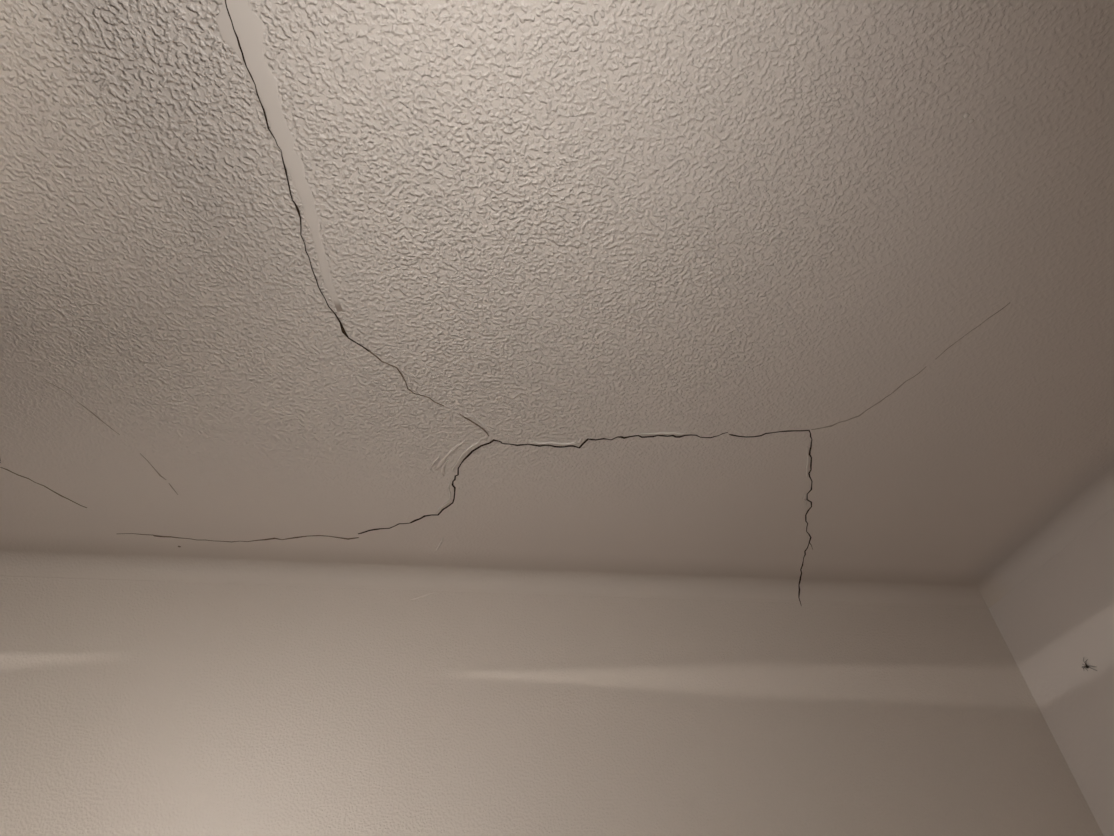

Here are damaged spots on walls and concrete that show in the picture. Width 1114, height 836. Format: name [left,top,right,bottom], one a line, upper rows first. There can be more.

crack [121,0,1008,604]